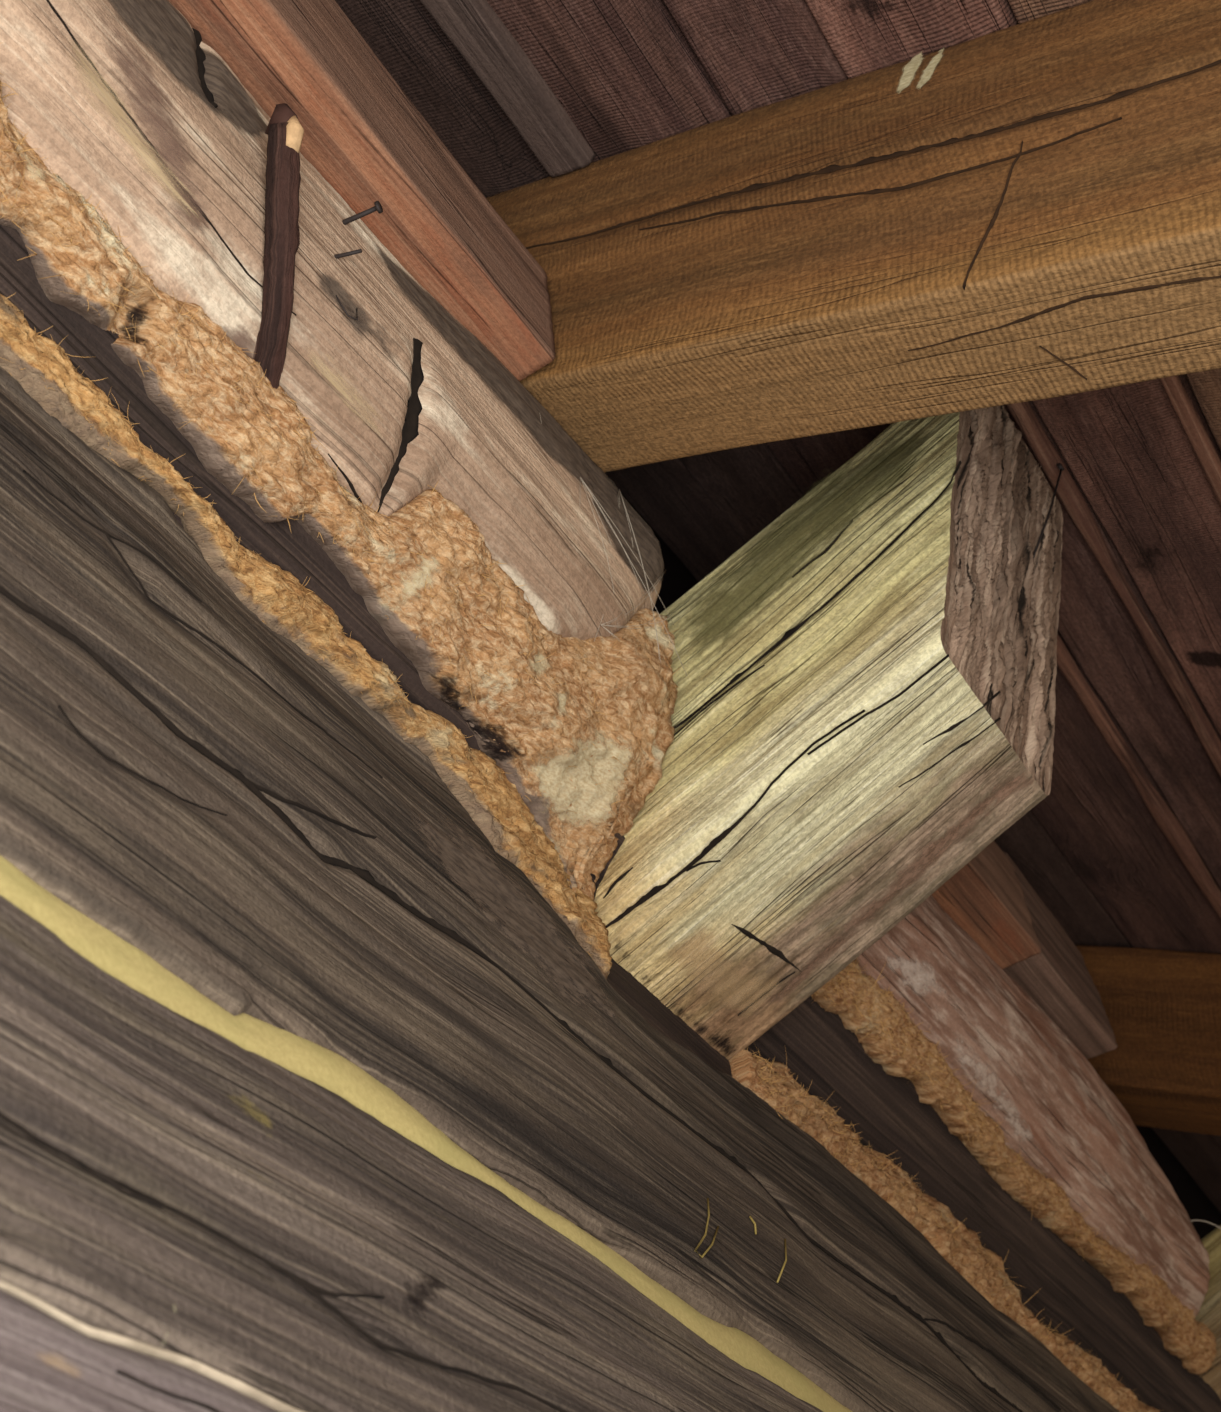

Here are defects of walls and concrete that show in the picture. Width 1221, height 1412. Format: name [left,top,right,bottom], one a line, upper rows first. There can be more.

crack [525,60,1221,290]
crack [908,275,1221,380]
crack [674,461,961,736]
crack [0,586,1061,1412]